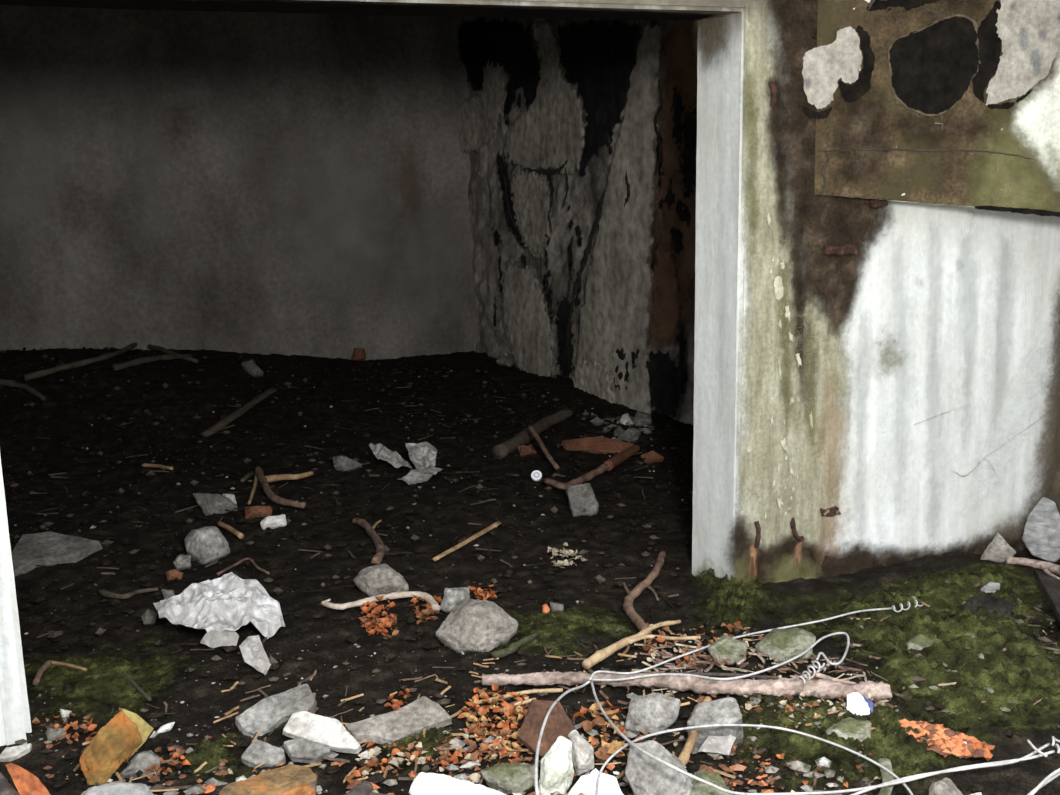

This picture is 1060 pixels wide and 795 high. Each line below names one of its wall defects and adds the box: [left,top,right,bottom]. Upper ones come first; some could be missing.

water stain [697,14,728,63]
peeling [802,25,875,119]
peeling [888,0,1060,121]
water stain [746,78,756,159]
water stain [748,175,756,230]
water stain [768,0,1060,435]
rust [820,505,841,517]
rust [795,541,803,564]